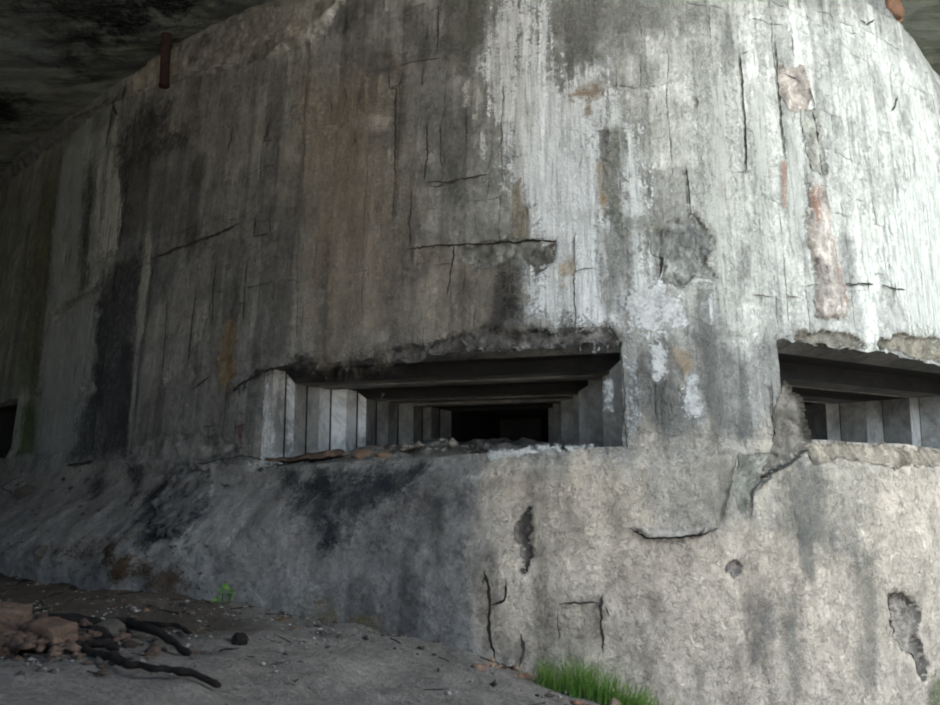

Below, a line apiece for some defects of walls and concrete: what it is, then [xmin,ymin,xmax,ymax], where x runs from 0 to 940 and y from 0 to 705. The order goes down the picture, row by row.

damp [22,141,131,462]
damp [118,230,152,453]
crack [371,6,597,342]
damp [444,0,772,438]
spalling [649,213,722,288]
crack [740,51,748,172]
damp [784,121,810,268]
flaking render [775,62,829,177]
spalling [785,328,940,363]
crack [628,446,810,539]
crack [482,571,507,658]
spalling [887,592,929,681]